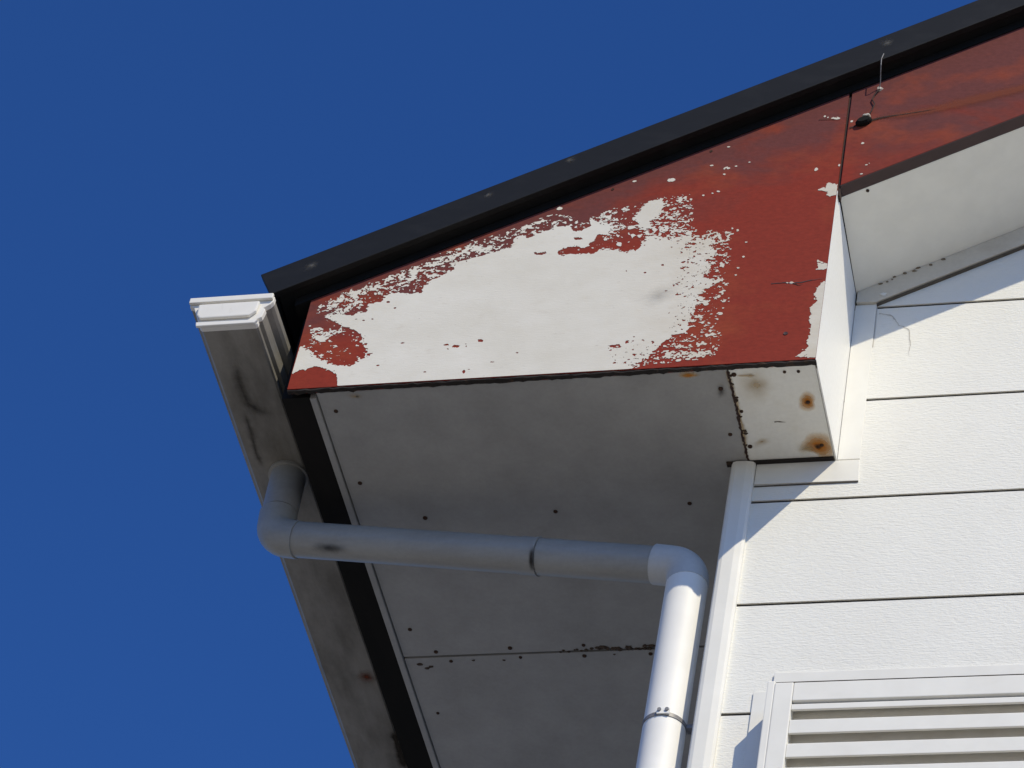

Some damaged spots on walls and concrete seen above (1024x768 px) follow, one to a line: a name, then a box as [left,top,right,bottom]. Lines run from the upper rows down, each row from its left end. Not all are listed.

peeling [818,183,838,196]
peeling [292,191,745,386]
peeling [795,260,827,358]
rust [802,395,813,408]
rust [802,437,831,455]